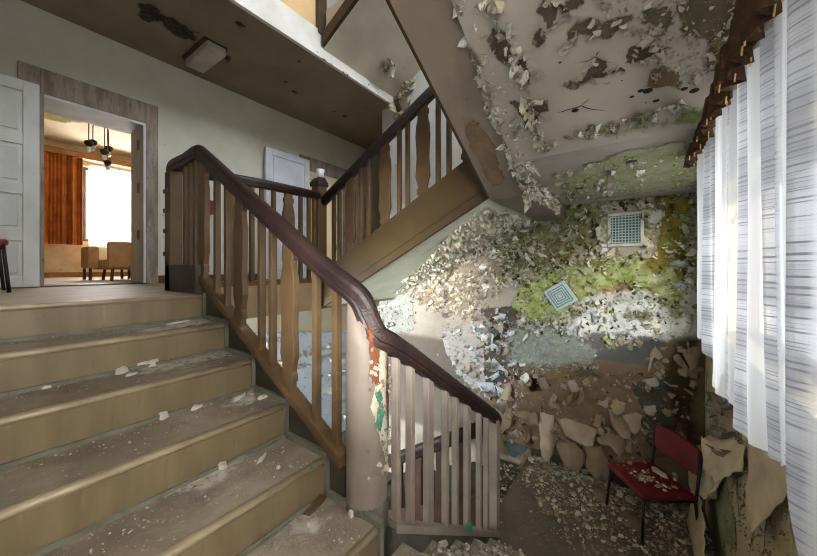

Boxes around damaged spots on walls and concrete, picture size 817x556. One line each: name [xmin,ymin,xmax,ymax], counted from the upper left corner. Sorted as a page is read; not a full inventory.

leakage [563,142,697,199]
peeling [377,0,740,498]
peeling [367,326,392,480]